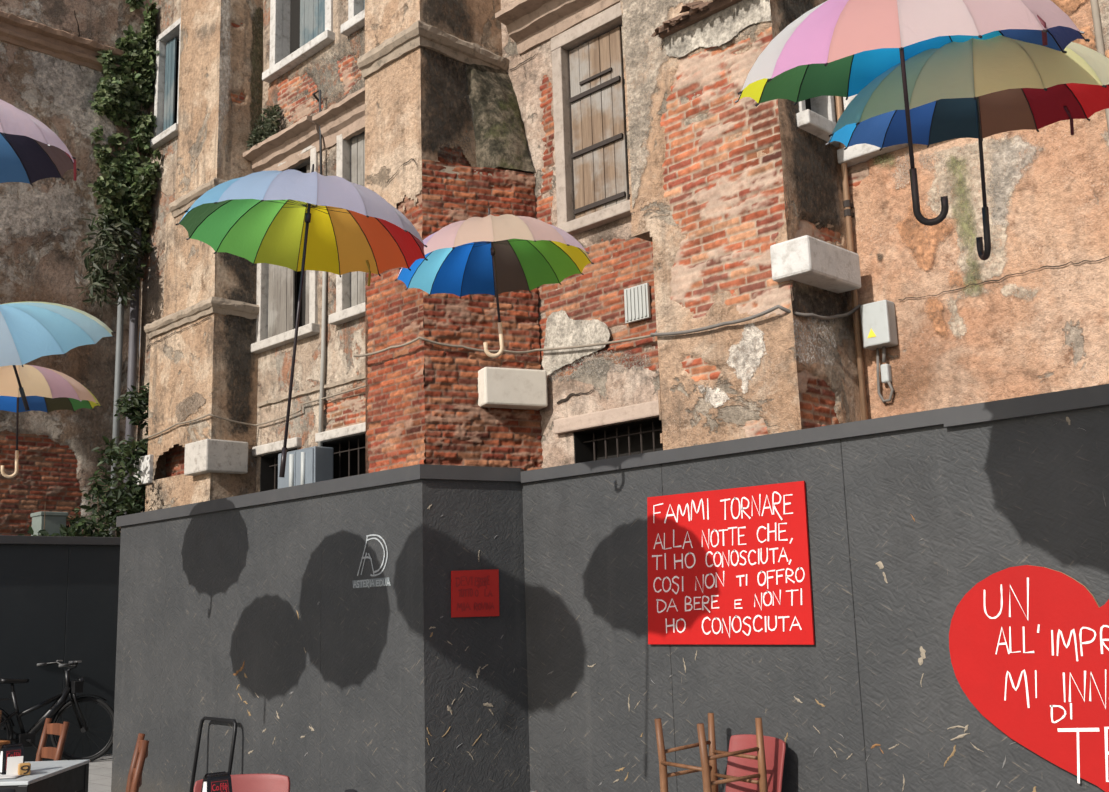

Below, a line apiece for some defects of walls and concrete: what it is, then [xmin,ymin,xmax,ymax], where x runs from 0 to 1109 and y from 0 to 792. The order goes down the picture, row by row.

leakage [421,47,474,163]
spalling [536,75,555,225]
spalling [622,0,841,318]
spalling [537,238,659,382]
spalling [682,355,721,381]
crack [899,256,1109,301]
spalling [0,429,83,536]
spalling [743,418,768,437]